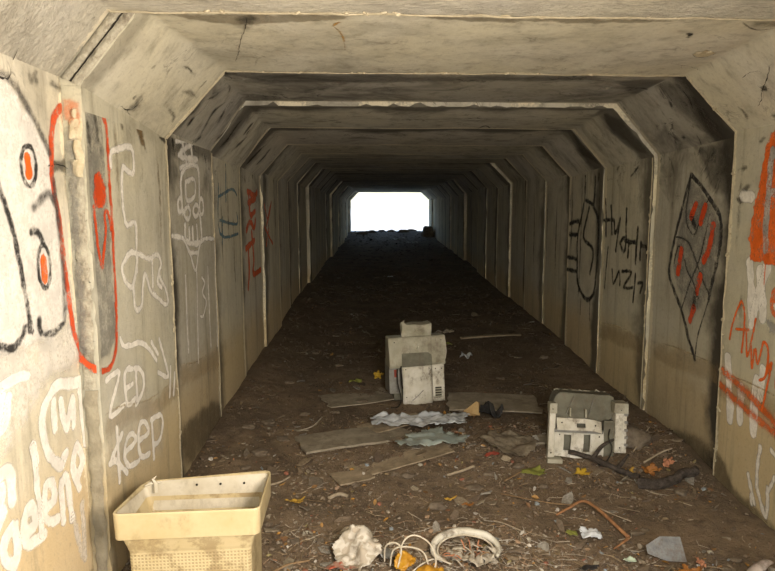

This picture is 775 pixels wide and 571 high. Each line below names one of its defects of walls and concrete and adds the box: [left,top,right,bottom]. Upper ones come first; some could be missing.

crack [235,17,255,61]
peeling [61,9,775,85]